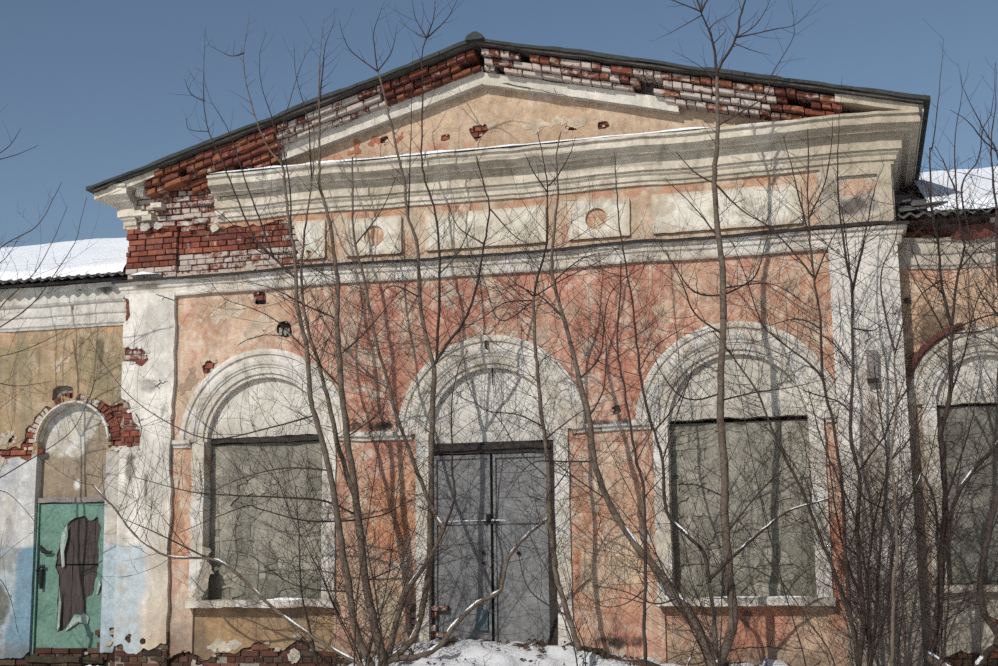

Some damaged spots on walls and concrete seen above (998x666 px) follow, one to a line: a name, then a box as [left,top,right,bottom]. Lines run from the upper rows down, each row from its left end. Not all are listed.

flaking render [123,48,847,280]
flaking render [124,345,150,366]
peeling [178,359,217,396]
flaking render [0,392,141,467]
flaking render [0,627,352,666]
flaking render [945,643,998,666]